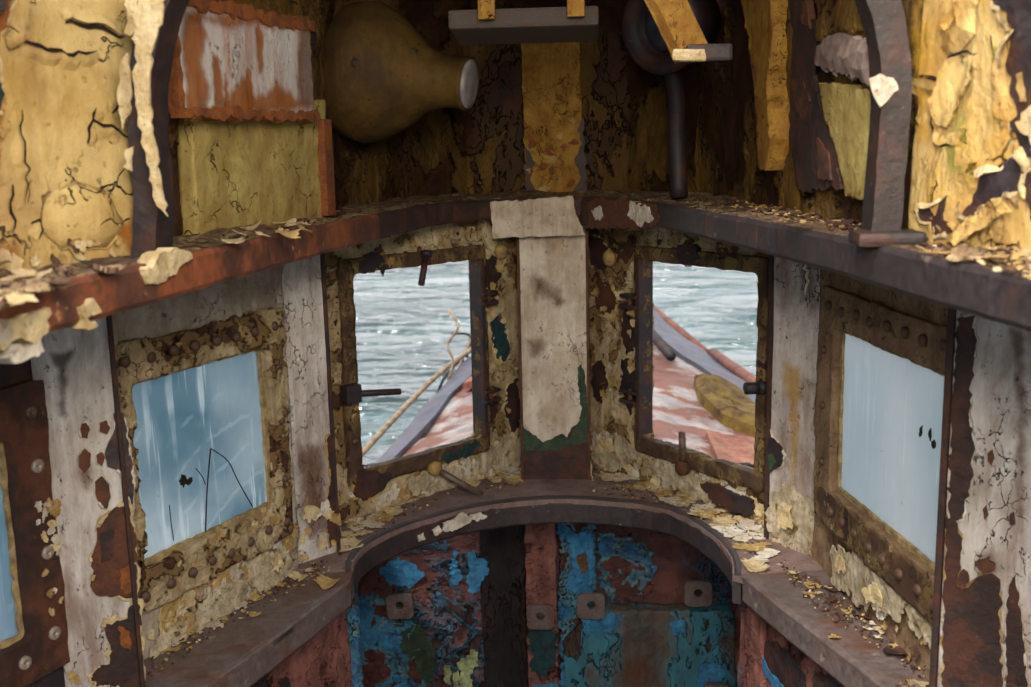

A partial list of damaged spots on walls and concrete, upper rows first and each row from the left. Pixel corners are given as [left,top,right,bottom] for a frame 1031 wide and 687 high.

crack [17,7,127,71]
corrosion [183,13,308,117]
crack [0,109,44,241]
crack [87,105,129,149]
spalling [911,0,1031,273]
peeling [0,237,126,312]
spalling [354,239,422,277]
spalling [441,230,925,661]
spalling [66,413,435,687]
peeling [358,549,489,687]
peeling [527,626,565,687]
peeling [696,596,741,687]